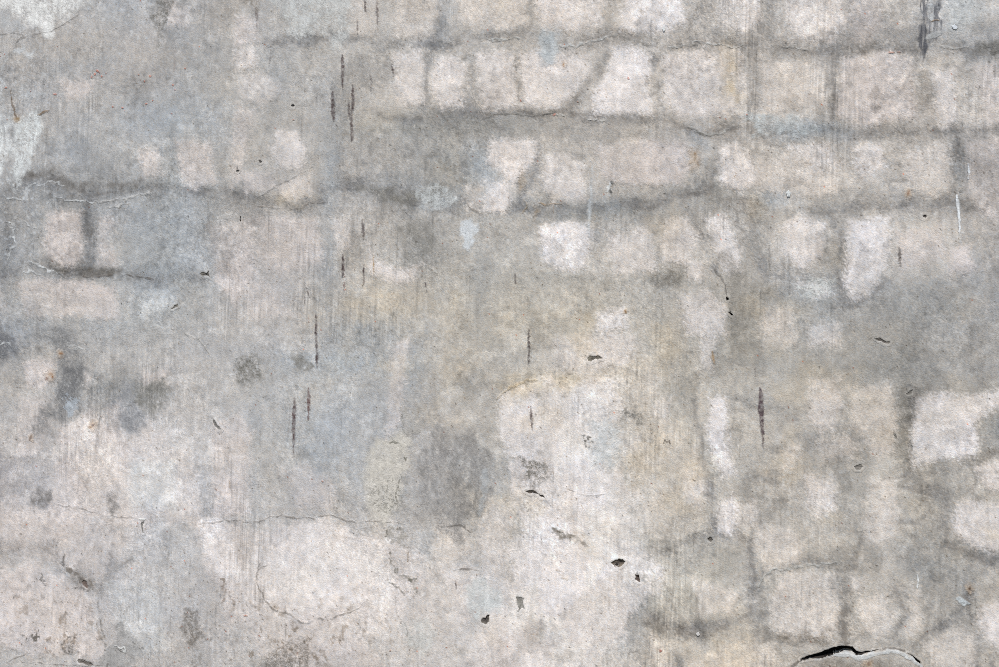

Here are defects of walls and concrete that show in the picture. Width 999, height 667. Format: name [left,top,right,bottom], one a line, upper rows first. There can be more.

damp [915,0,999,65]
damp [411,420,500,546]
crack [54,502,139,519]
crack [198,513,421,525]
crack [446,523,472,533]
crack [453,565,479,573]
spalling [607,555,643,585]
spalling [512,593,528,616]
crack [790,642,924,667]